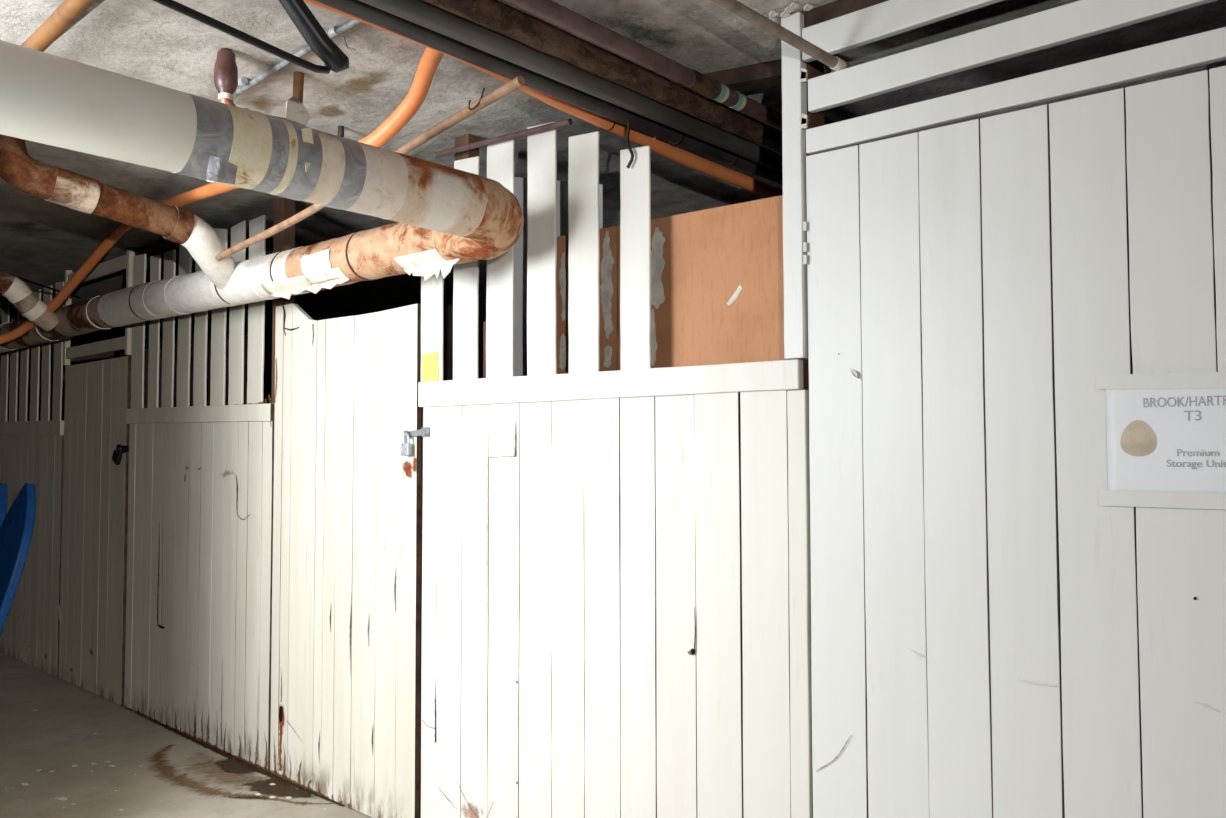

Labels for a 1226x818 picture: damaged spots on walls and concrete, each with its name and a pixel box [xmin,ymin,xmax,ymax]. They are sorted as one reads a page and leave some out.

corrosion [403,458,416,478]
leakage [120,693,351,809]